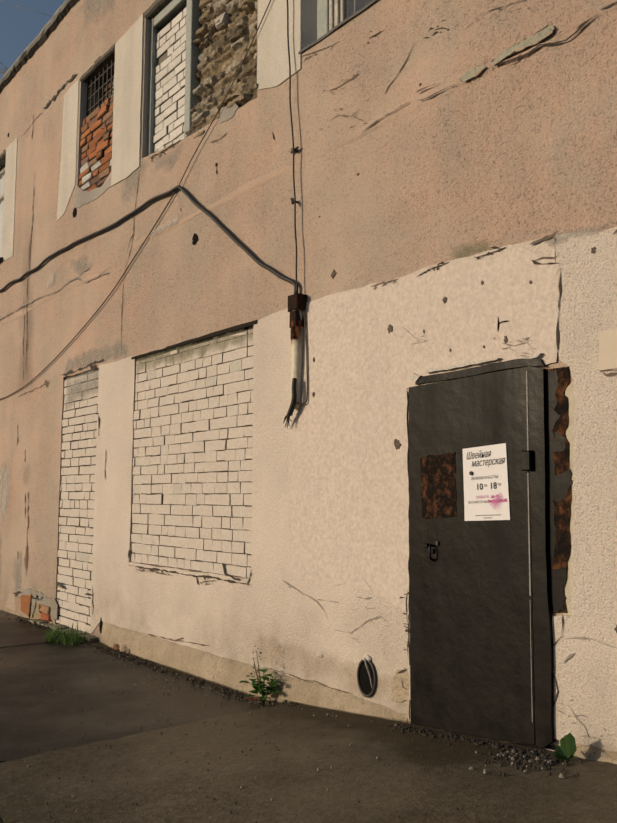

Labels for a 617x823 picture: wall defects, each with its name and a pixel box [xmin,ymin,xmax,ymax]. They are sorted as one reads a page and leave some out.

spalling [185,0,258,139]
peeling [458,24,555,82]
crack [492,0,617,66]
crack [362,83,458,132]
rust [543,367,570,475]
crack [128,550,251,585]
rust [552,485,572,614]
spalling [6,588,58,624]
crack [284,581,339,618]
crack [265,667,351,694]